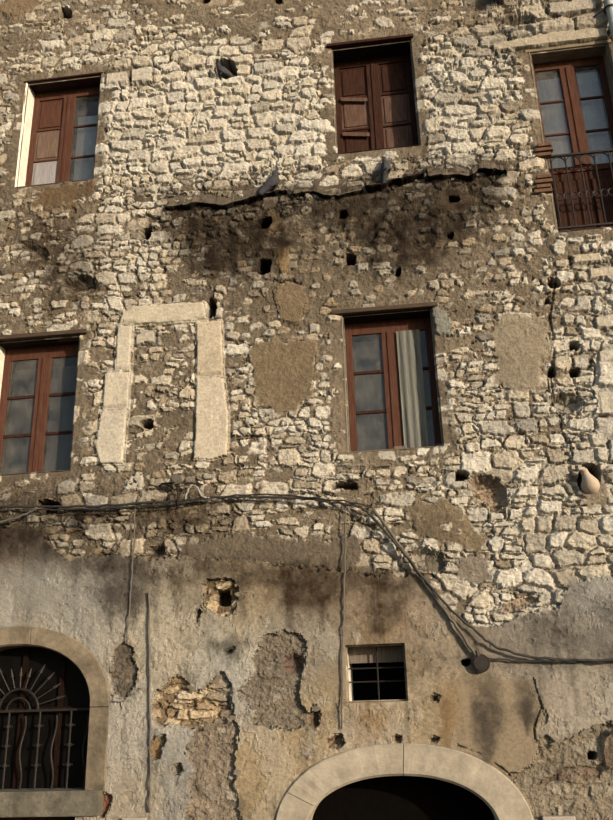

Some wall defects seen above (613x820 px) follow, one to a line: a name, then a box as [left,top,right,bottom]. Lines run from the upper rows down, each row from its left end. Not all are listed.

water stain [163,194,305,272]
water stain [316,162,503,276]
flaking render [196,577,240,623]
flaking render [110,642,139,699]
flaking render [148,629,321,820]